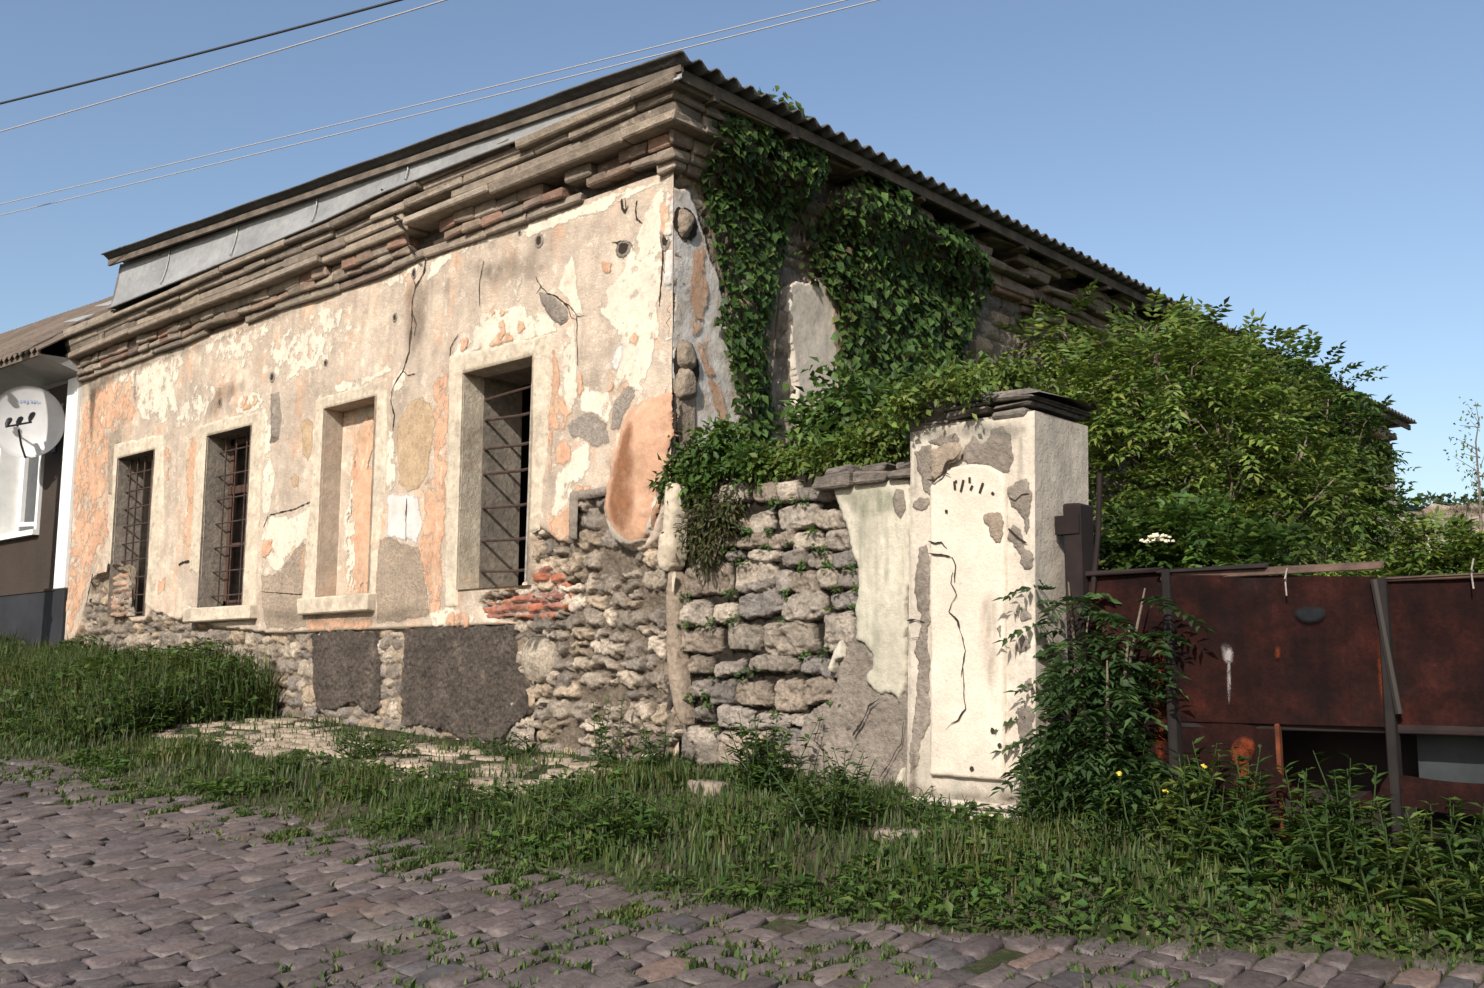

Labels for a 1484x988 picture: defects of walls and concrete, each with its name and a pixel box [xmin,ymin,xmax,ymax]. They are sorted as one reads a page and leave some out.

crack [381,189,426,425]
flaking render [66,179,763,762]
flaking render [783,277,853,442]
flaking render [793,426,1035,790]
crack [907,541,966,728]
corrosion [1232,738,1258,818]